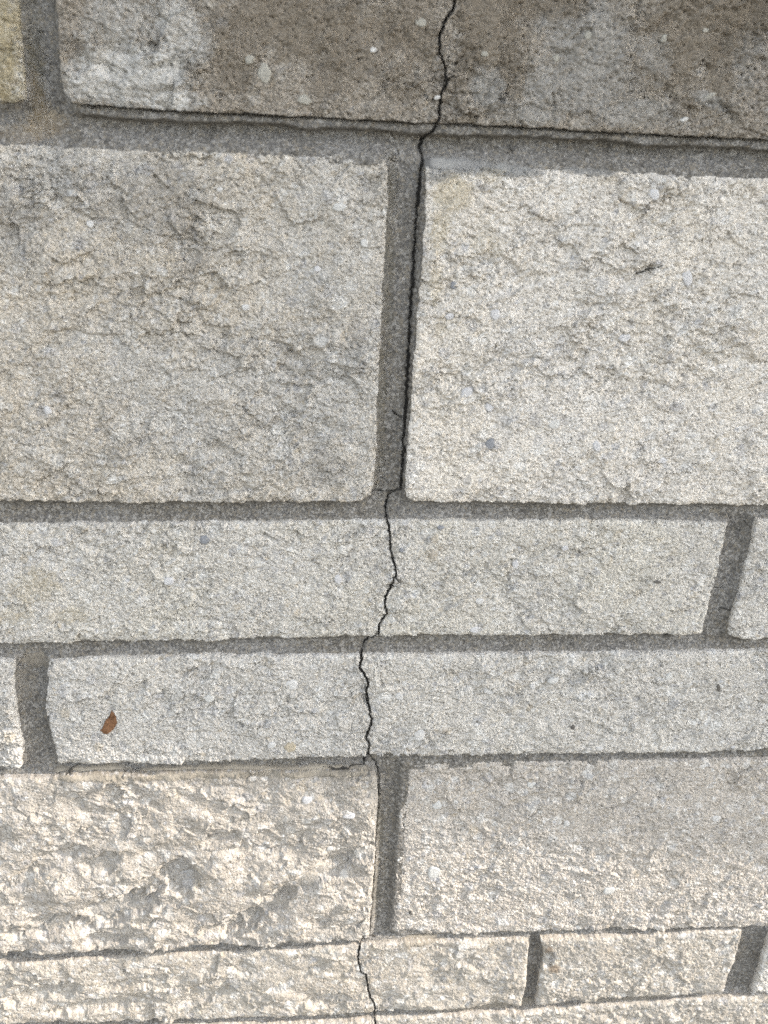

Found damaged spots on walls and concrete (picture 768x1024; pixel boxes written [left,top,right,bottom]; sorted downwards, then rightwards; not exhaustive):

crack [322,0,764,1024]